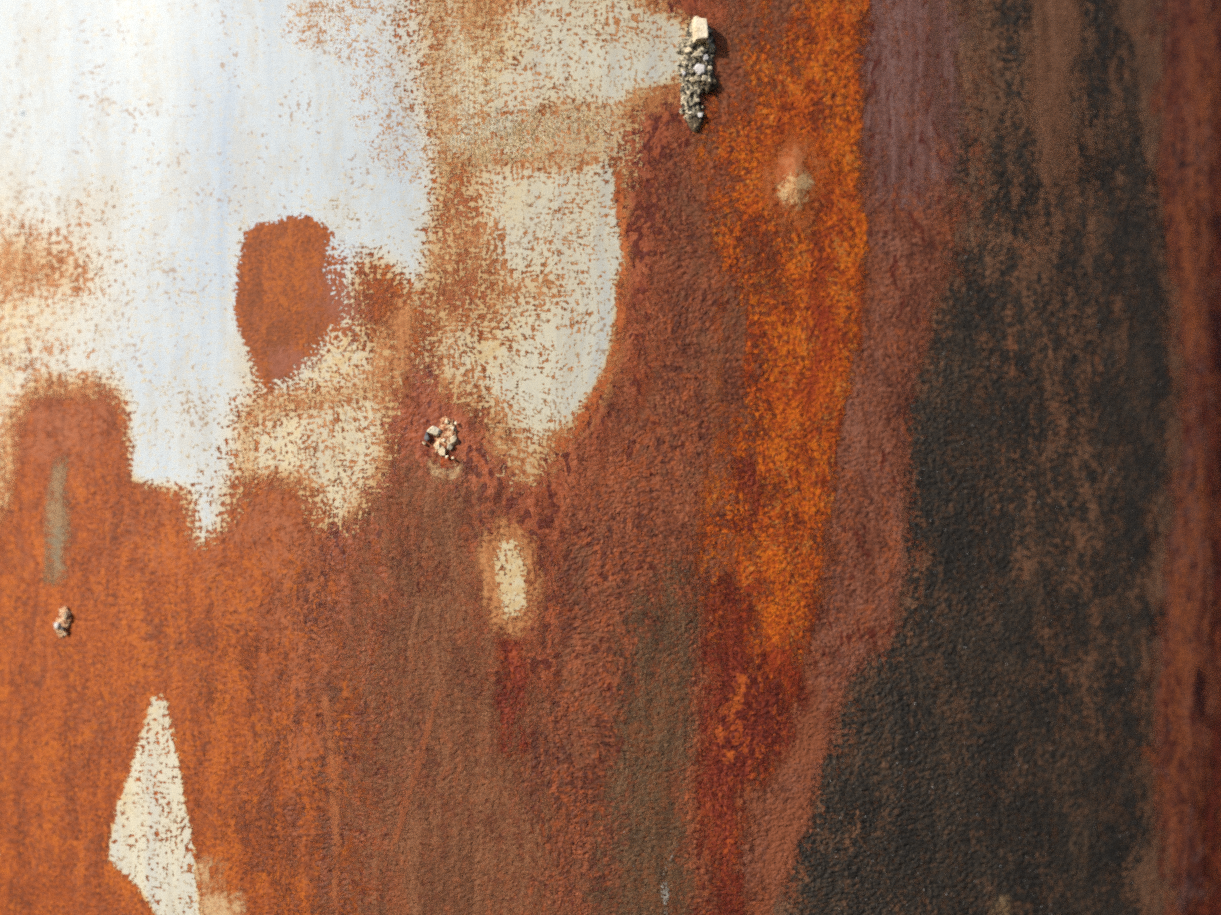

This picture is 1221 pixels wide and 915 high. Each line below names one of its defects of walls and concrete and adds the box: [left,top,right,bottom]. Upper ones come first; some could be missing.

spalling [53,605,73,638]
peeling [107,693,203,915]
peeling [0,0,718,550]
rust [0,0,729,915]
peeling [490,536,528,621]
rust [695,0,992,915]
rust [1138,0,1221,915]